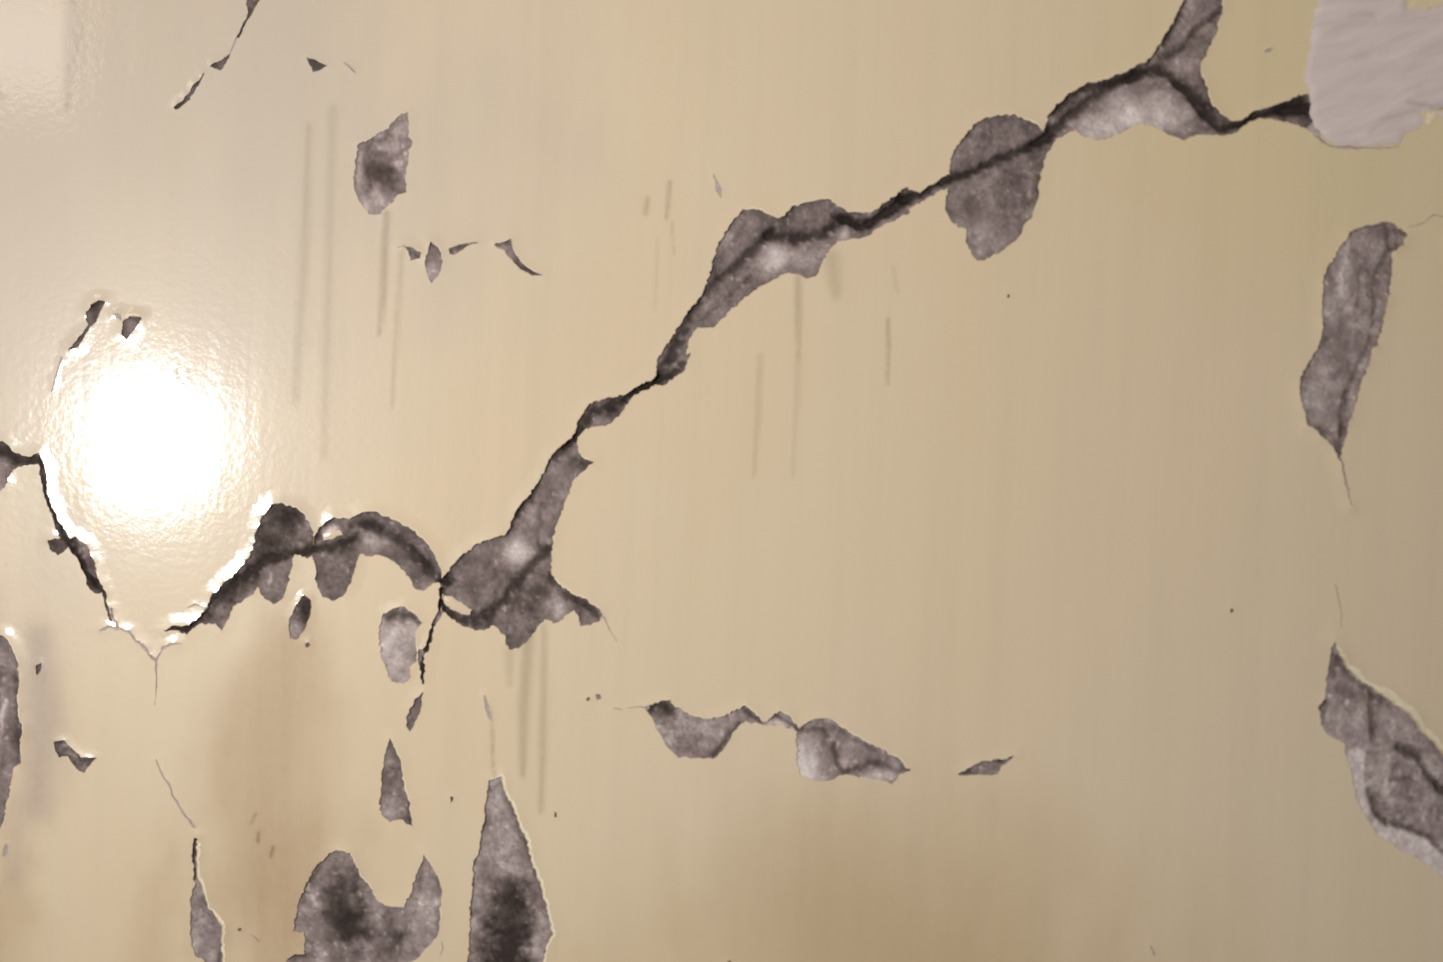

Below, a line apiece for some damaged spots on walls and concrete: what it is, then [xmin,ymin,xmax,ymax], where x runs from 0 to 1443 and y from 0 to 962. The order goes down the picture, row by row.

peeling [163,0,266,115]
peeling [343,100,556,289]
crack [0,0,1443,739]
peeling [1274,209,1424,523]
peeling [370,594,430,690]
peeling [0,623,107,869]
crack [148,753,201,828]
peeling [177,826,236,962]
peeling [273,728,569,962]
peeling [633,686,924,793]
peeling [1303,618,1443,895]